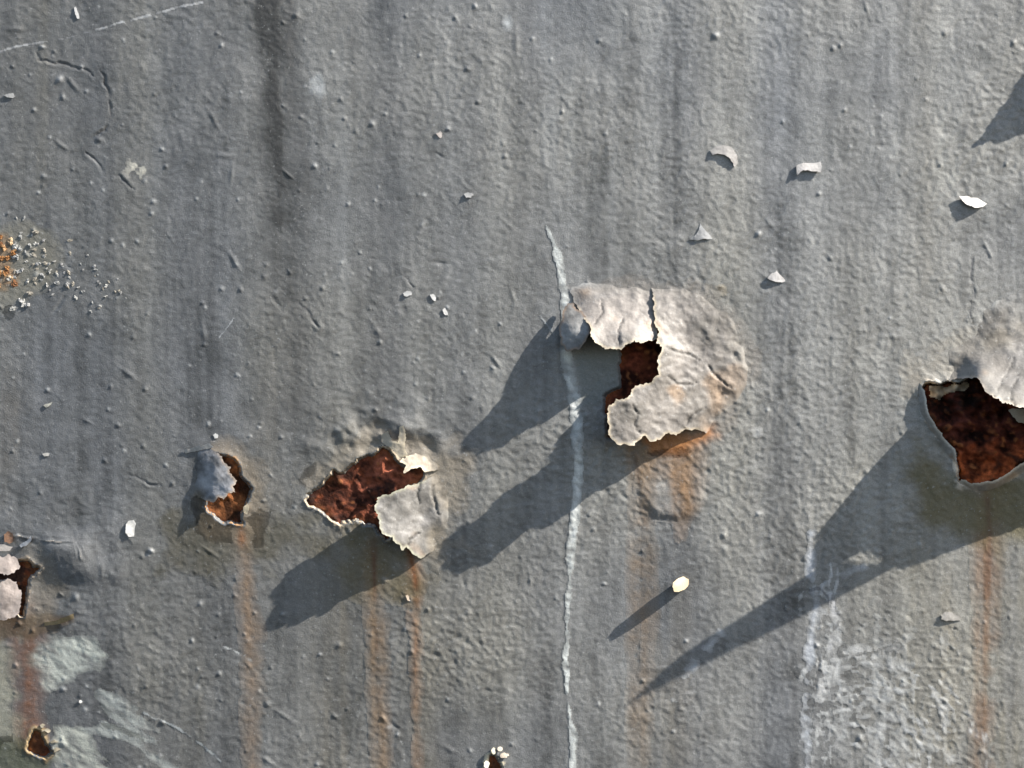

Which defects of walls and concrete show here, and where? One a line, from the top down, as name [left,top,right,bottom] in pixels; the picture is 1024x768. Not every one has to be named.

corrosion [0,216,127,315]
peeling [559,273,763,458]
peeling [897,290,1024,491]
peeling [184,433,273,545]
peeling [291,417,479,575]
water stain [539,225,584,768]
peeling [0,531,74,626]
corrosion [152,496,443,768]
water stain [797,529,969,768]
peeling [23,724,60,764]
peeling [483,746,509,768]